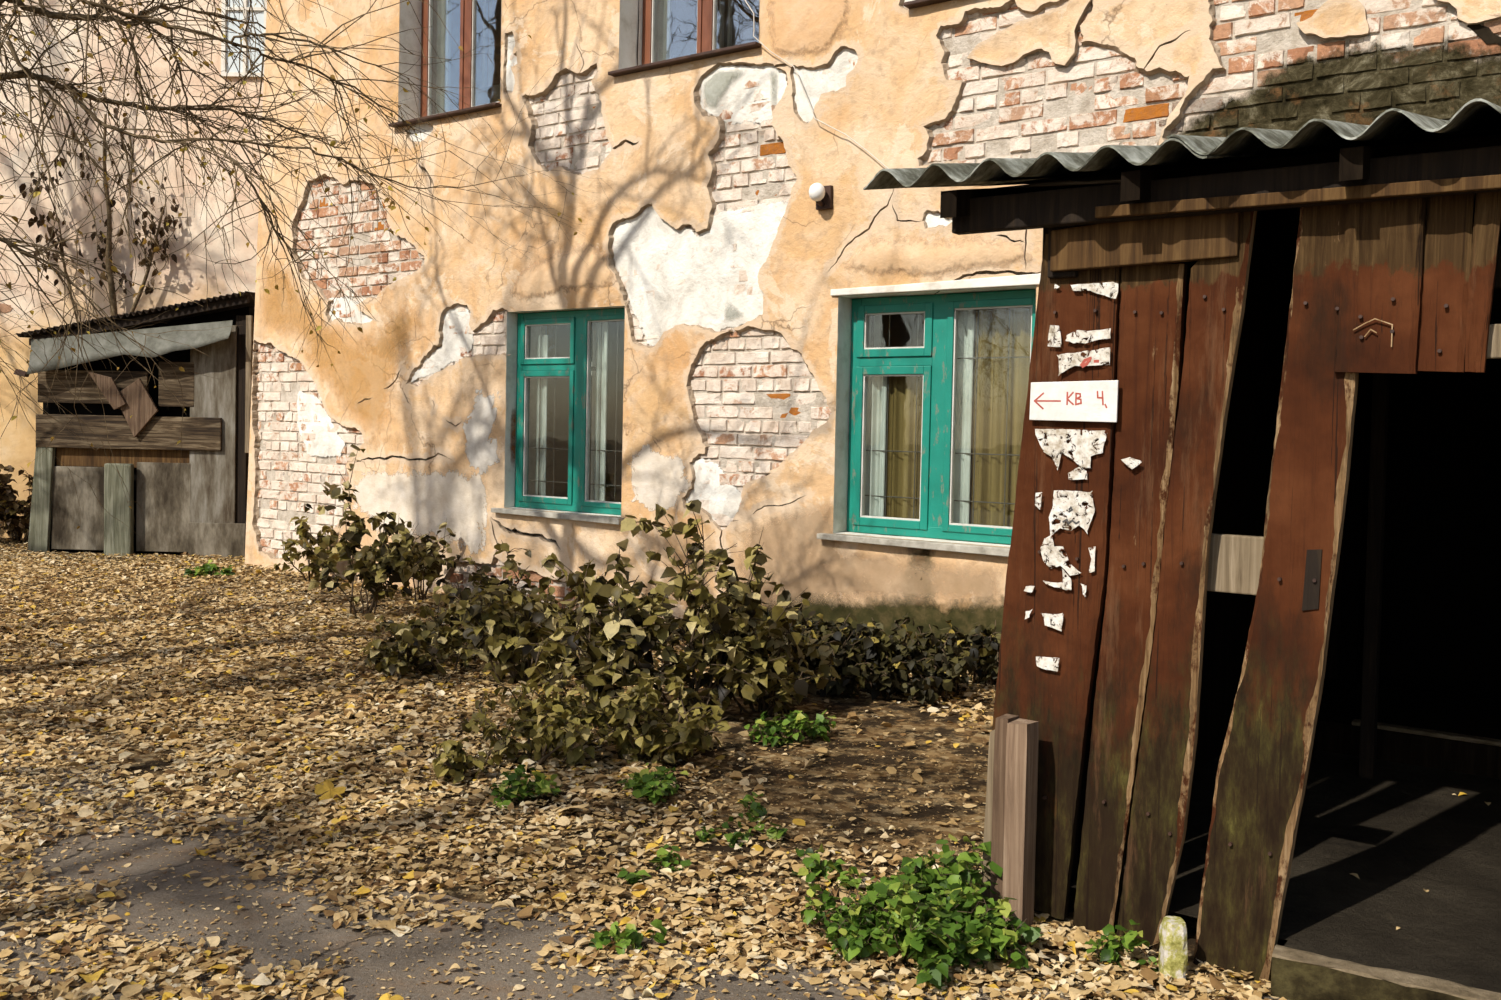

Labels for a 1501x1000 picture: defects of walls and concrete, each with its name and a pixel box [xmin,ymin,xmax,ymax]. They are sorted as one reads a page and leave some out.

flaking render [503,31,616,175]
flaking render [918,0,1501,166]
water stain [1181,40,1501,137]
flaking render [292,174,424,325]
crack [356,369,461,462]
flaking render [252,340,581,610]
flaking render [405,303,510,387]
crack [490,517,561,553]
flaking render [608,46,858,531]
crack [829,189,921,270]